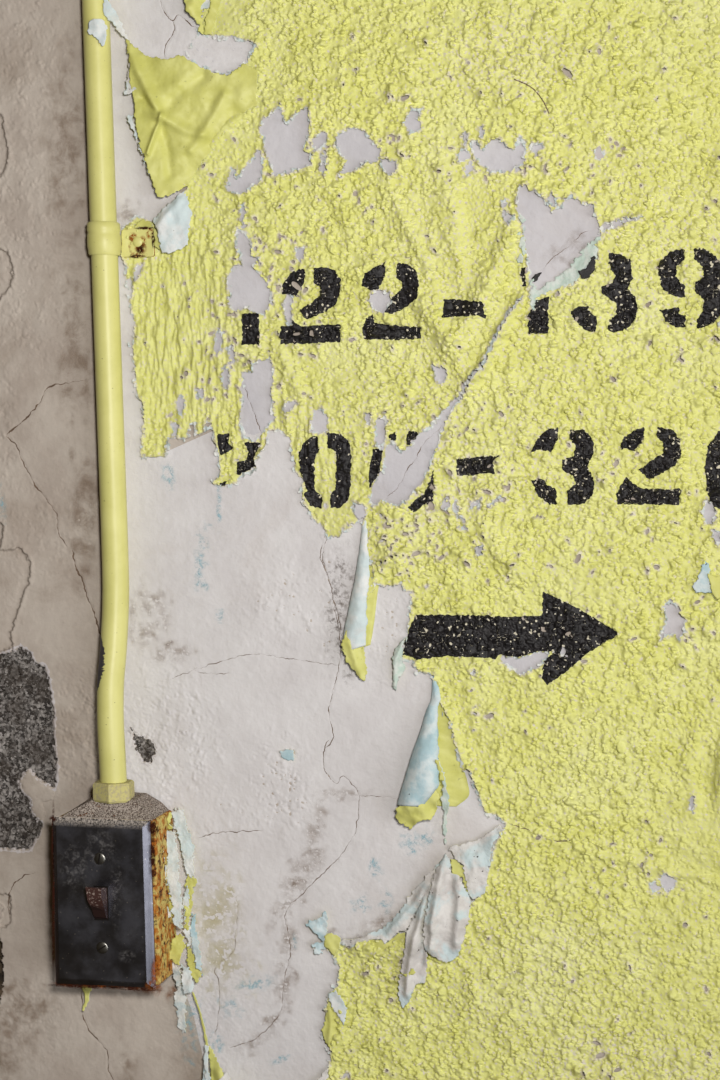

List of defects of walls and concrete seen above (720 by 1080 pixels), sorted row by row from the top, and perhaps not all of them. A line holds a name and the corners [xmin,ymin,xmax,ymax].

peeling [0,114,8,177]
rust [128,227,154,258]
spalling [0,523,61,853]
crack [7,380,101,635]
crack [176,542,392,1048]
peeling [87,0,643,1080]